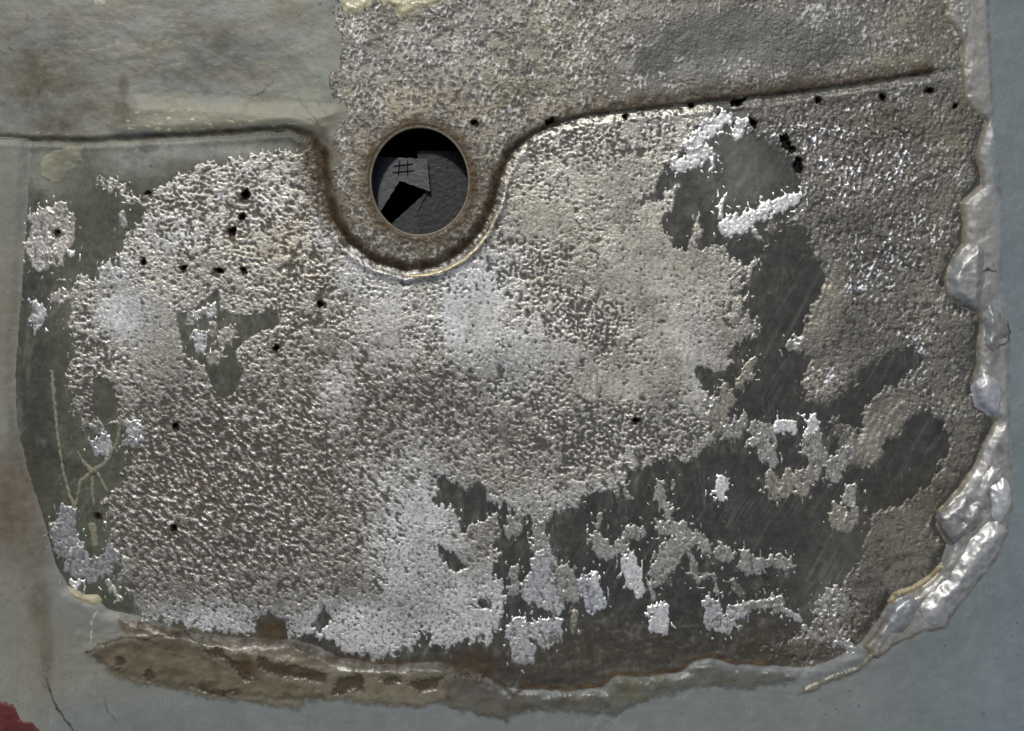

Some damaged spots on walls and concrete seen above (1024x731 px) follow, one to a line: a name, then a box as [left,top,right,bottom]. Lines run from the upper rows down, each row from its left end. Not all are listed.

peeling [663,106,754,179]
peeling [22,144,85,336]
peeling [113,202,132,237]
peeling [711,185,808,248]
corrosion [62,100,762,668]
corrosion [329,0,989,669]
peeling [779,330,809,356]
peeling [83,411,150,460]
peeling [696,350,867,537]
peeling [43,502,126,604]
peeling [496,472,862,674]
corrosion [431,653,740,697]